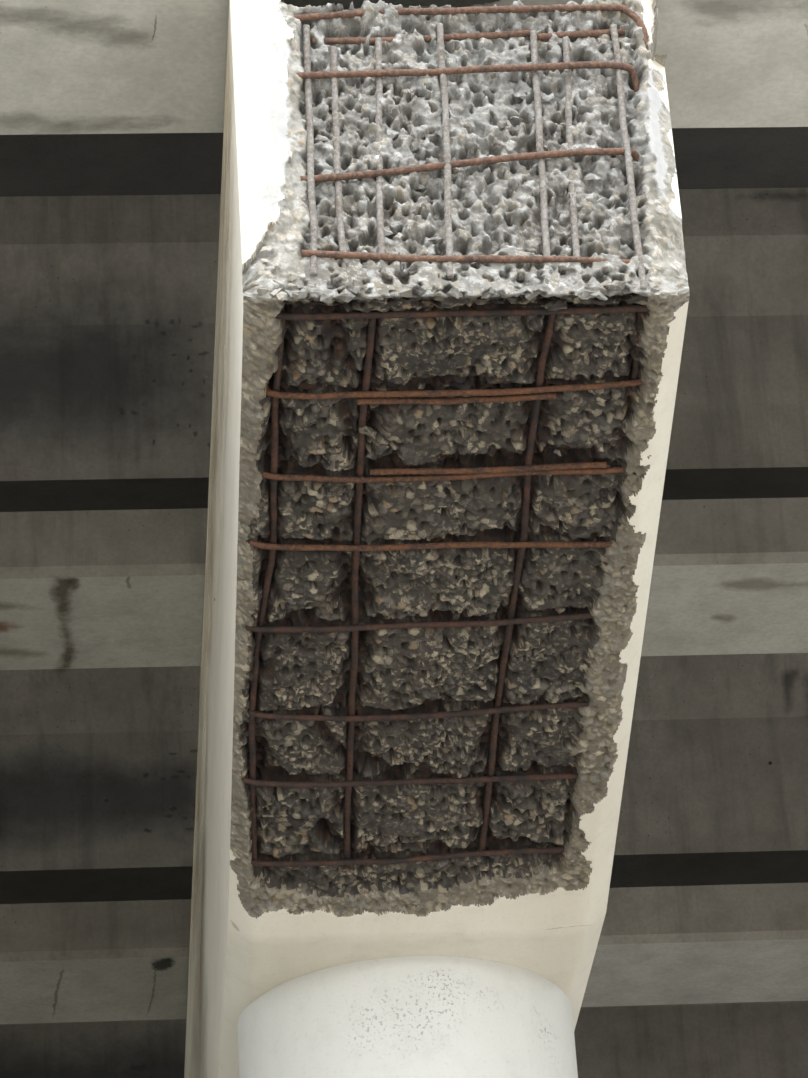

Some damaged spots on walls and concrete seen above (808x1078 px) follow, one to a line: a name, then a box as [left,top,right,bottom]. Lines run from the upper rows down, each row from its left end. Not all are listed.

damp [54,579,77,616]
spalling [230,0,690,919]